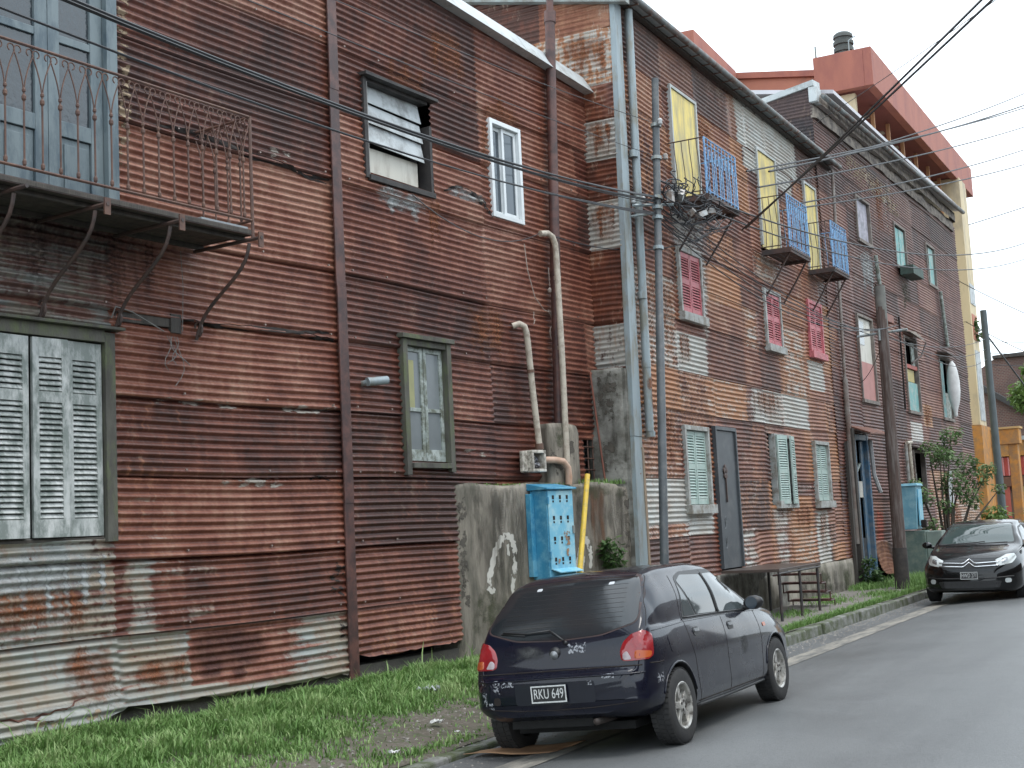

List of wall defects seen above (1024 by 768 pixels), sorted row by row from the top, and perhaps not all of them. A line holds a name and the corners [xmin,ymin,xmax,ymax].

rust [567,40,606,76]
rust [0,588,82,626]
rust [67,648,112,694]
rust [138,656,185,685]